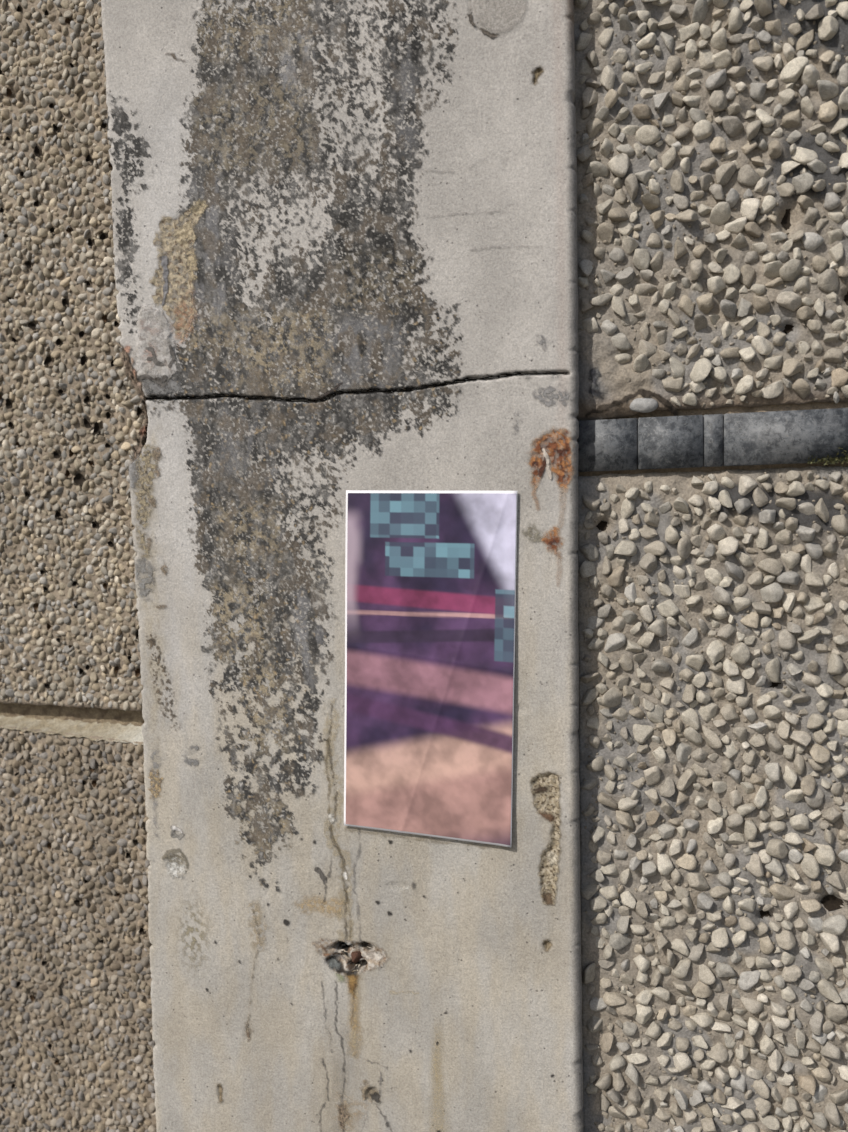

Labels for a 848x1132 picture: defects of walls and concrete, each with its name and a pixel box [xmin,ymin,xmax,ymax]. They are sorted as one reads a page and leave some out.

mould [104,96,151,333]
peeling [149,200,207,342]
water stain [139,0,462,892]
crack [146,368,678,427]
rust [529,429,574,504]
rust [524,526,563,556]
crack [314,704,361,943]
spalling [531,772,561,905]
rust [337,974,358,1054]
spalling [312,939,389,975]
crack [319,983,388,1131]